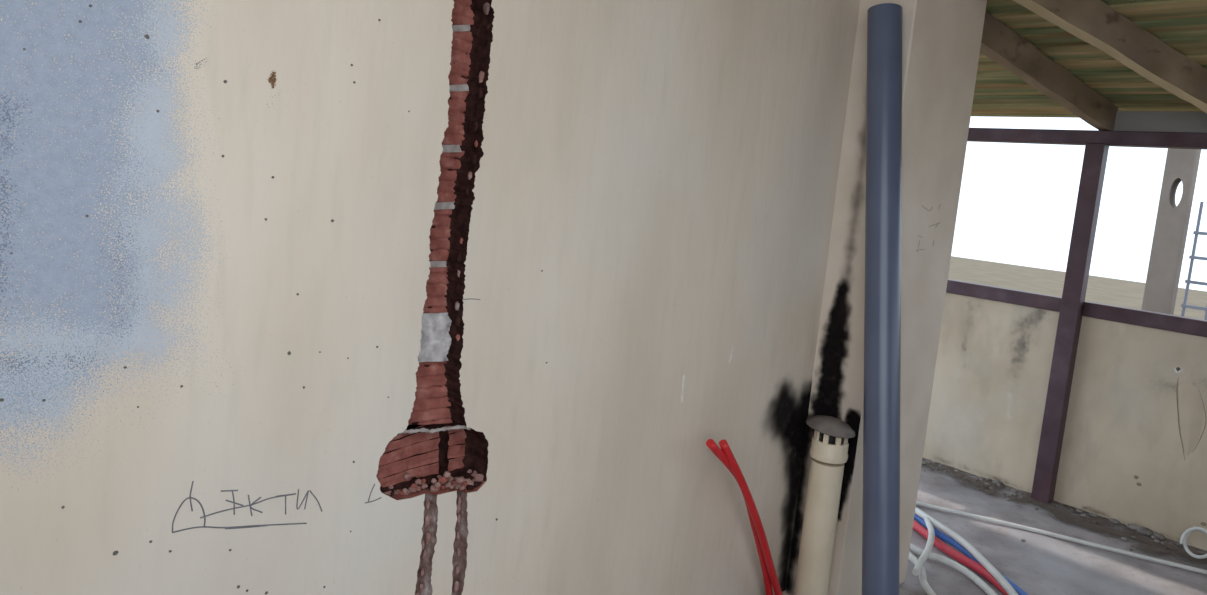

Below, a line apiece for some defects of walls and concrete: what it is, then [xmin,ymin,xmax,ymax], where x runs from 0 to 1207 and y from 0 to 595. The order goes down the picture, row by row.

damp [0,0,227,490]
crack [1176,381,1206,460]